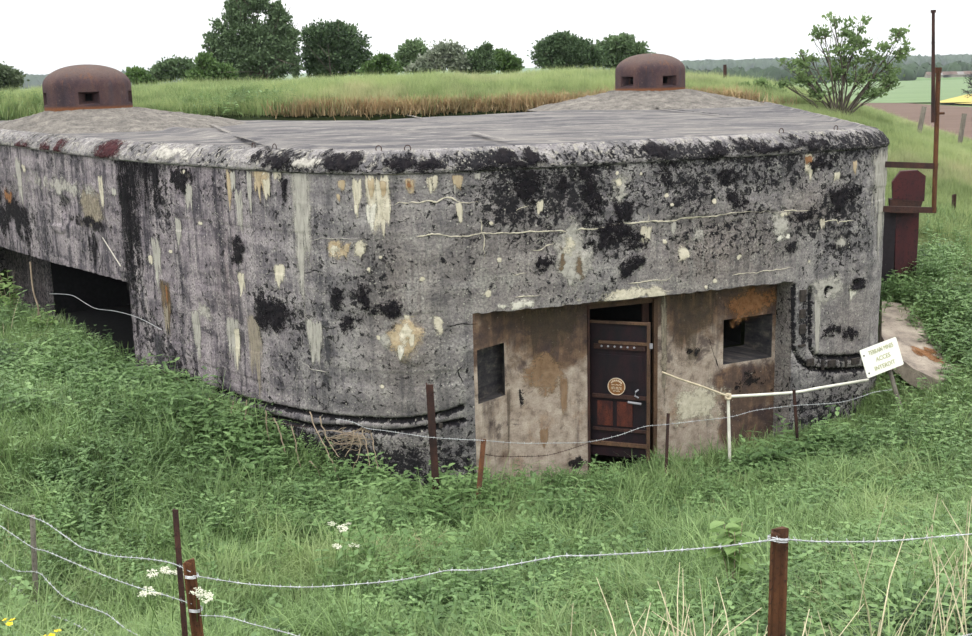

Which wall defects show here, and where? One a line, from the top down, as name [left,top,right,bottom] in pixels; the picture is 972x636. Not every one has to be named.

leakage [6,145,199,354]
leakage [226,156,321,306]
leakage [352,175,391,236]
peeling [554,215,593,301]
leakage [509,166,652,280]
crack [395,197,853,253]
crack [628,279,672,291]
leakage [192,310,201,359]
leakage [226,264,422,396]
peeling [381,317,444,363]